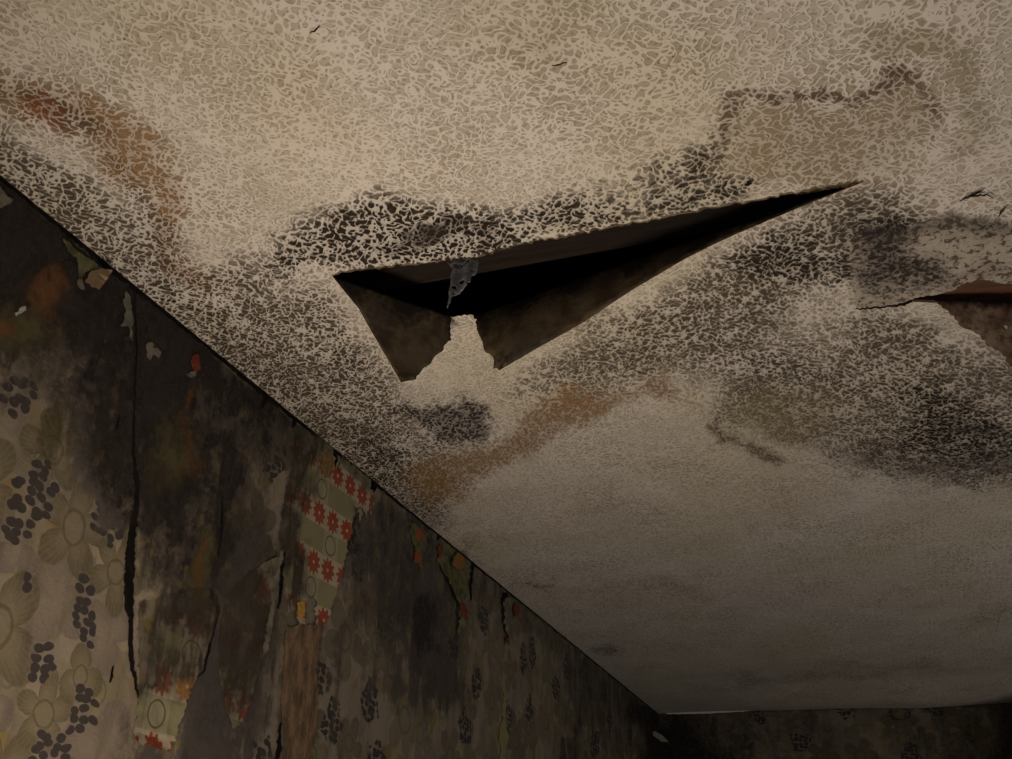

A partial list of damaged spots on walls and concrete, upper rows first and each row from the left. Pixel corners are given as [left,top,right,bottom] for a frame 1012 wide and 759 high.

peeling [134,427,374,753]
crack [0,175,656,712]
damp [0,65,919,608]
damp [526,191,1012,491]
peeling [849,219,1012,308]